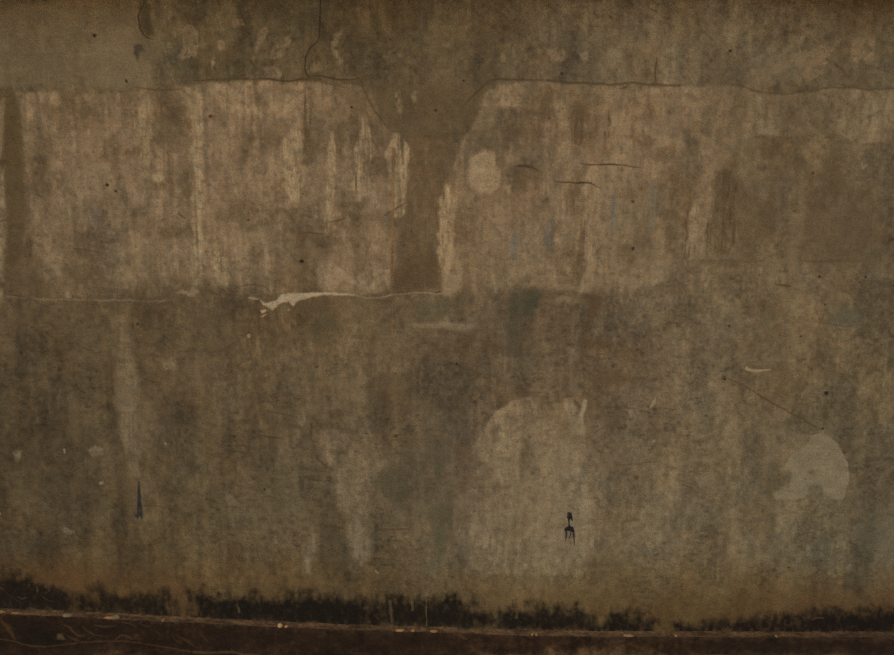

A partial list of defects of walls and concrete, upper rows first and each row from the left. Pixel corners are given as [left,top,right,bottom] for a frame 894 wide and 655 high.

peeling [0,17,409,318]
crack [134,0,391,130]
water stain [279,81,339,237]
water stain [349,112,461,299]
crack [460,57,681,109]
water stain [0,563,894,655]